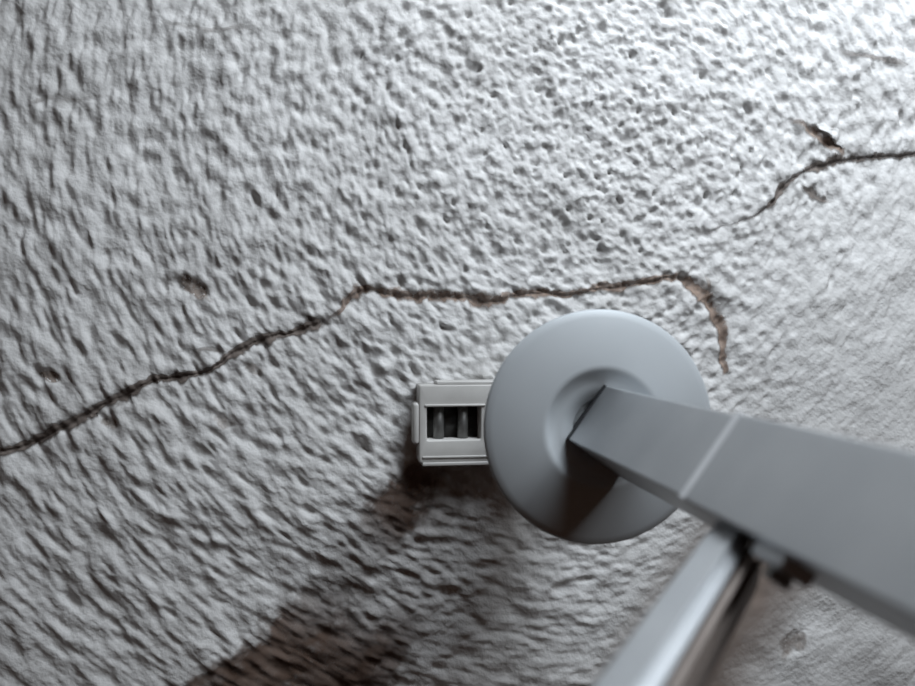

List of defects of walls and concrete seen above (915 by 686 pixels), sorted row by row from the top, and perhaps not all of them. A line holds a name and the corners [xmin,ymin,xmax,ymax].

crack [737,120,915,224]
crack [0,273,729,455]